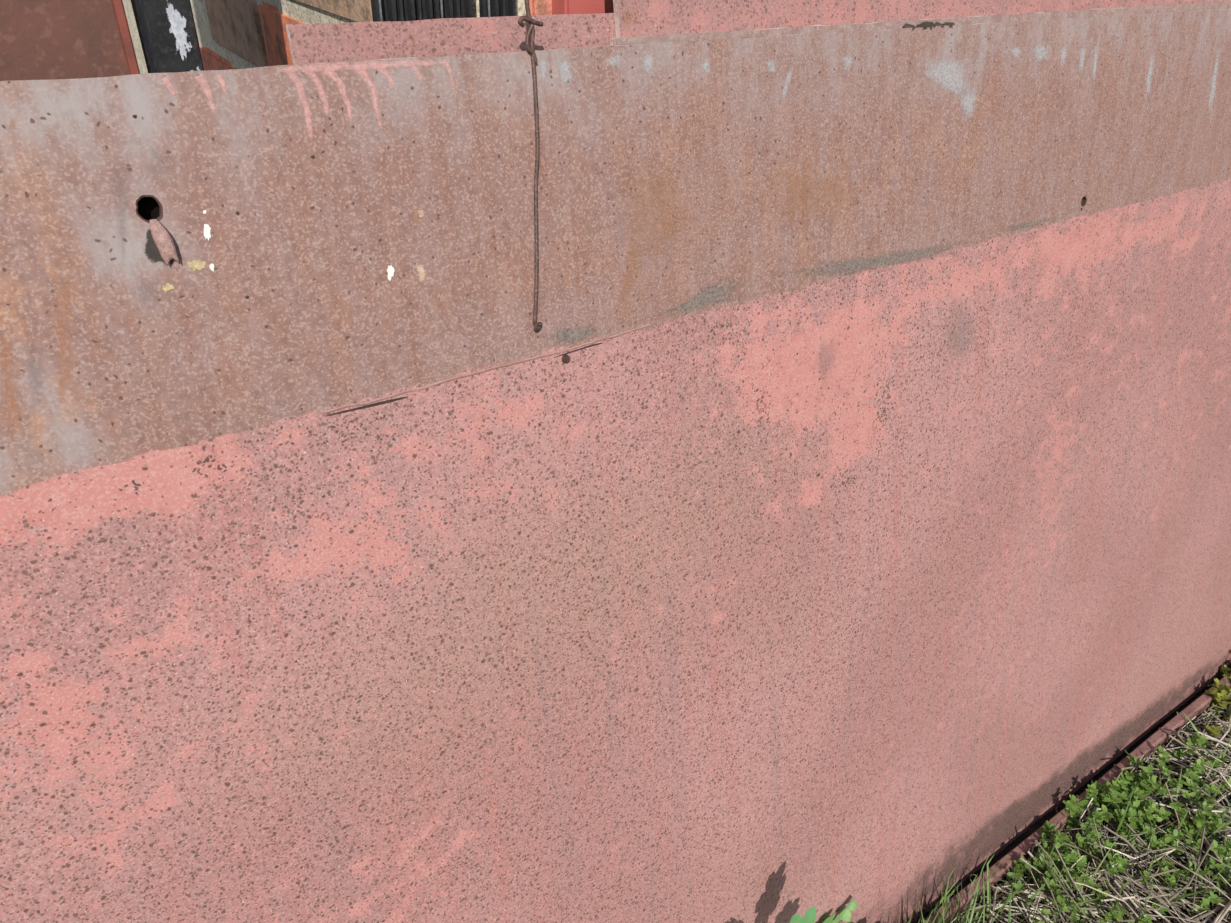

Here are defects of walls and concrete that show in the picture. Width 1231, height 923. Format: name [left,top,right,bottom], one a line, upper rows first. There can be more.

water stain [196,75,225,110]
water stain [283,61,453,137]